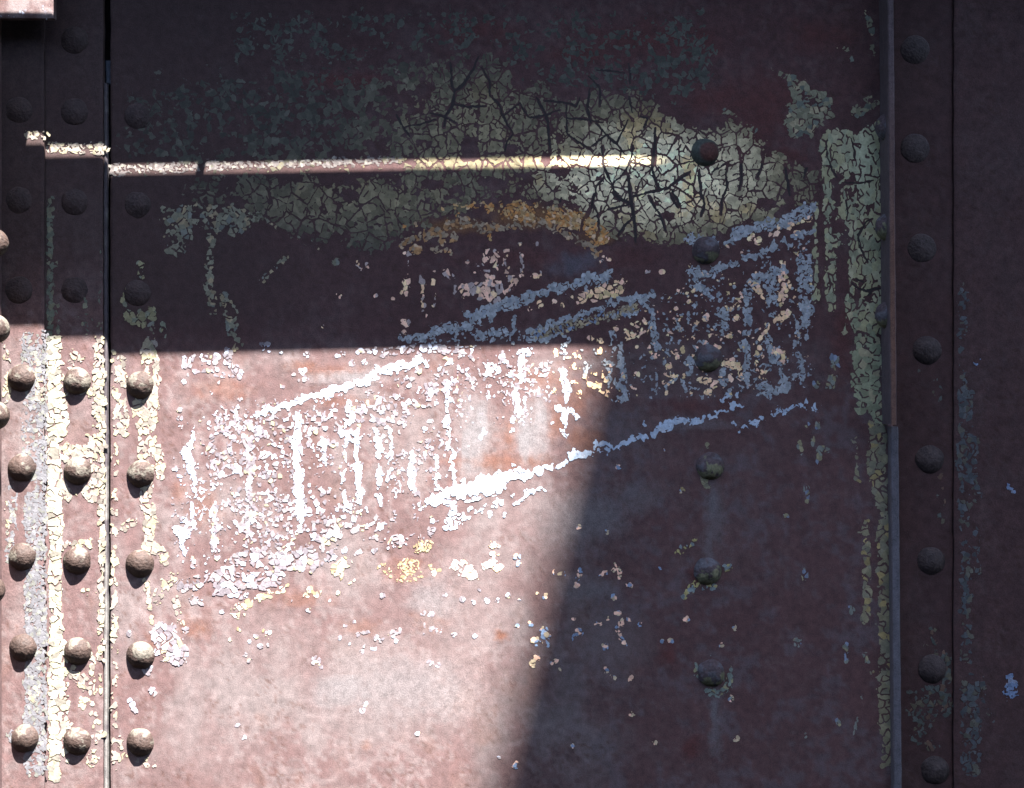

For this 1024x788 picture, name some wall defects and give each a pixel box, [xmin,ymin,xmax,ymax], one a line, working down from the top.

crack [396,56,881,296]
rust [827,275,857,405]
peeling [2,344,11,403]
rust [179,357,407,410]
peeling [108,5,891,769]
rust [491,359,765,475]
peeling [4,196,169,783]
rust [166,472,230,538]
rust [422,449,457,475]
rust [372,553,444,591]
rust [133,615,223,653]
rust [259,585,393,642]